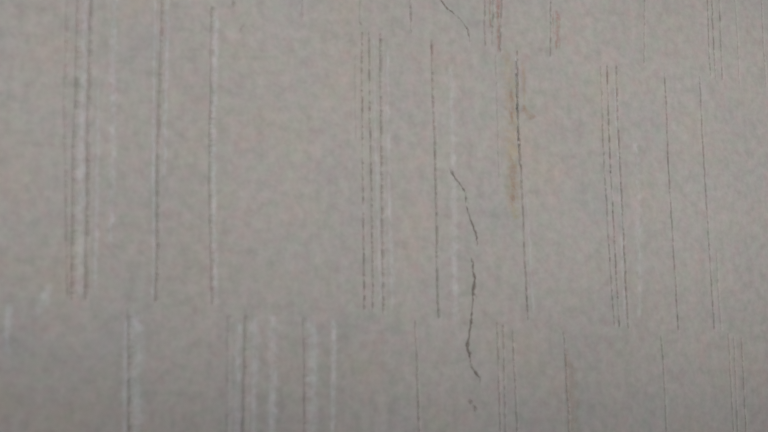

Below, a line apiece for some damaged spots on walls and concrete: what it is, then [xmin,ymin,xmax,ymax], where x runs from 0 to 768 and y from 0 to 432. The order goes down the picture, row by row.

crack [452,172,481,383]